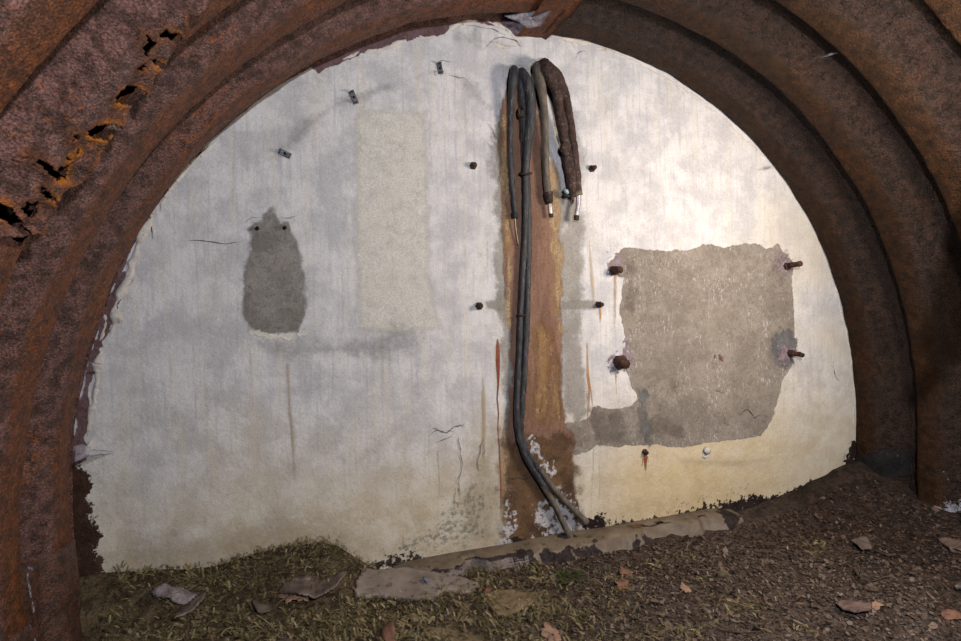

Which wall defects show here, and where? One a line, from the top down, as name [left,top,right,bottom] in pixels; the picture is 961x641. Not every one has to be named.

flaking render [243,208,306,334]
corrosion [496,78,583,545]
flaking render [557,195,798,455]